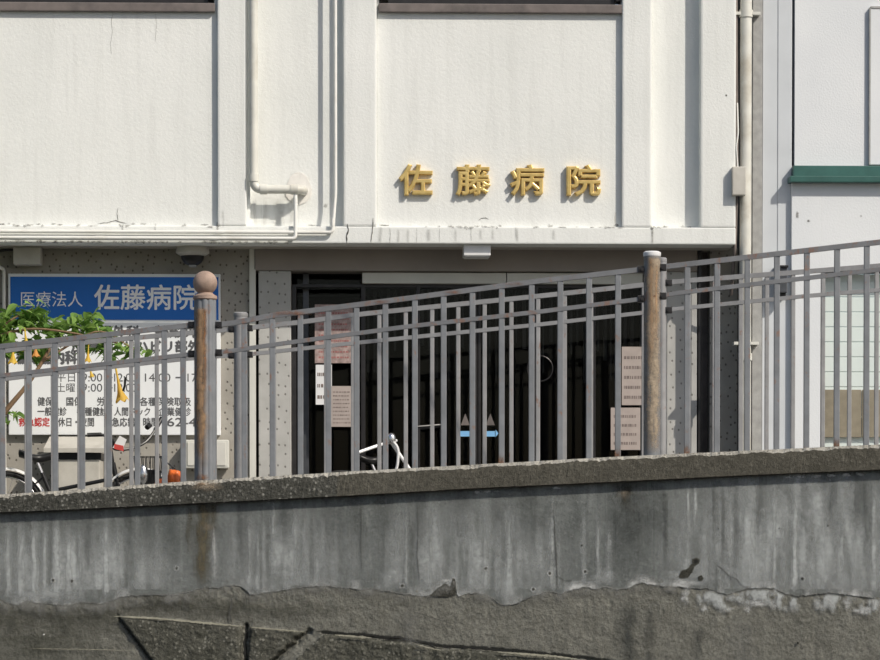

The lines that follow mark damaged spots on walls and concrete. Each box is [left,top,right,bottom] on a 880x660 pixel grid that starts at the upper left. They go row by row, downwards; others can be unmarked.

damp [4,529,125,603]
damp [189,505,216,578]
damp [247,512,297,592]
damp [388,518,443,588]
damp [467,518,559,597]
peeling [200,558,878,613]
damp [568,526,611,590]
damp [628,577,656,588]
damp [684,491,697,569]
damp [703,473,879,596]